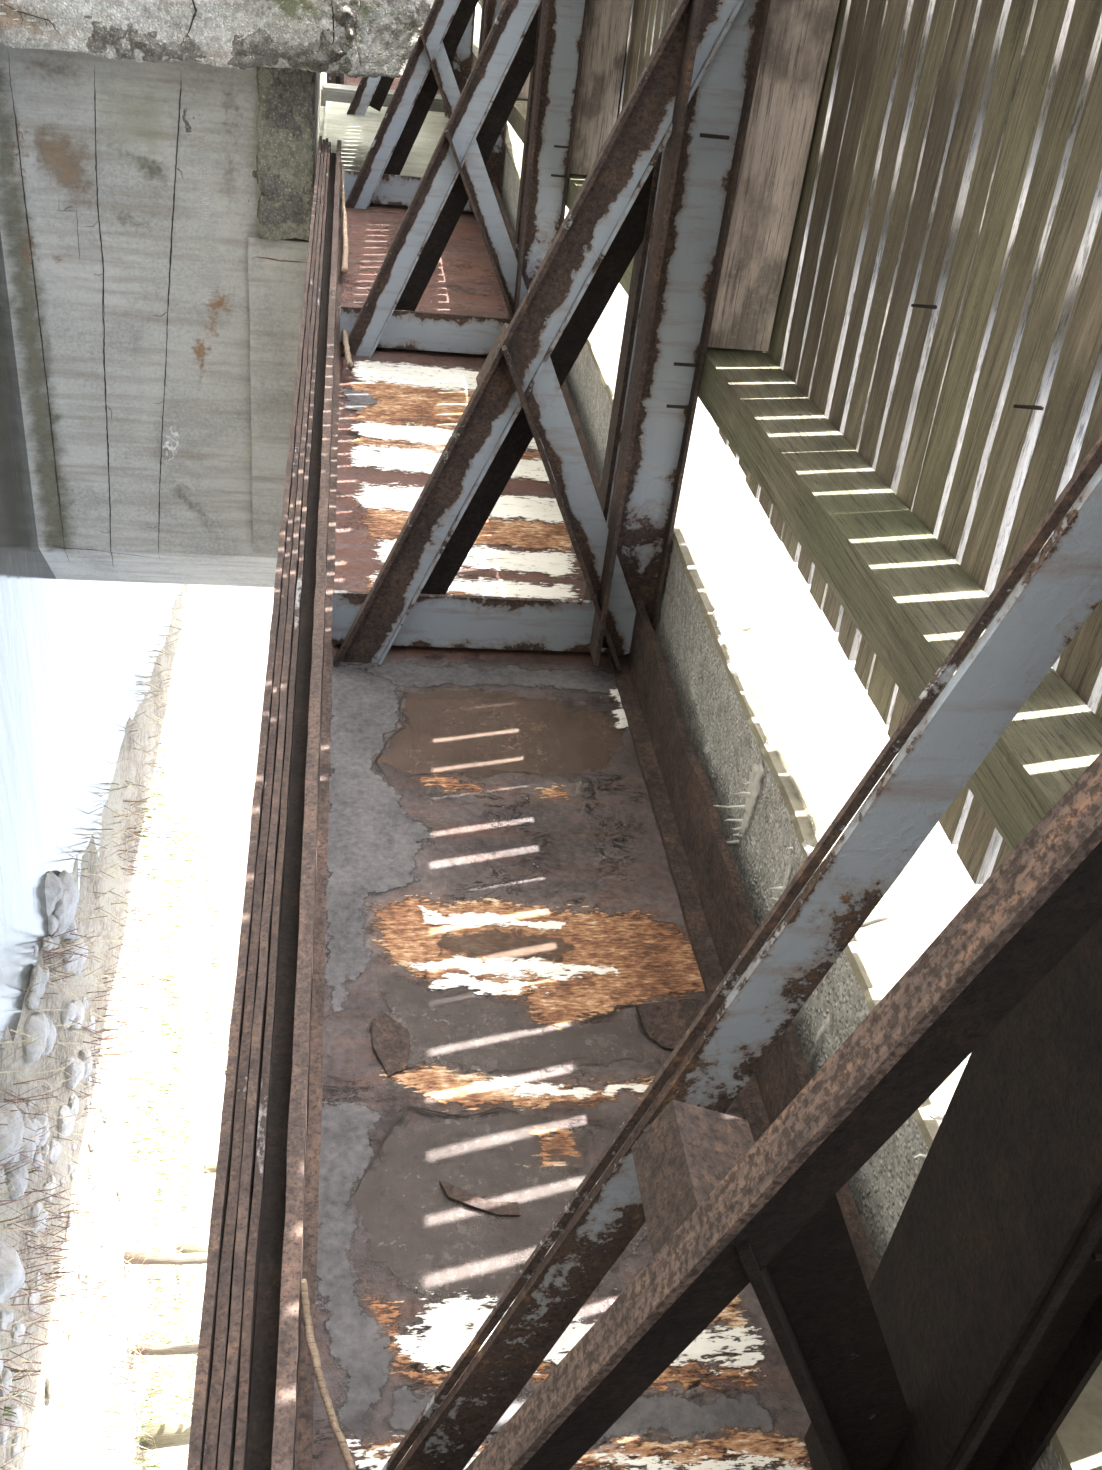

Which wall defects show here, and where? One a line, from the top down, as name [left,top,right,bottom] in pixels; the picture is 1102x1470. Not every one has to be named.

crack [186,0,197,38]
crack [3,3,183,564]
corrosion [193,298,228,367]
peeling [349,420,454,515]
peeling [488,438,564,523]
peeling [448,545,582,600]
peeling [409,954,620,998]
corrosion [306,661,713,1460]
peeling [394,1287,515,1372]
peeling [670,1323,766,1377]
corrosion [708,1295,748,1339]
corrosion [576,1355,812,1470]